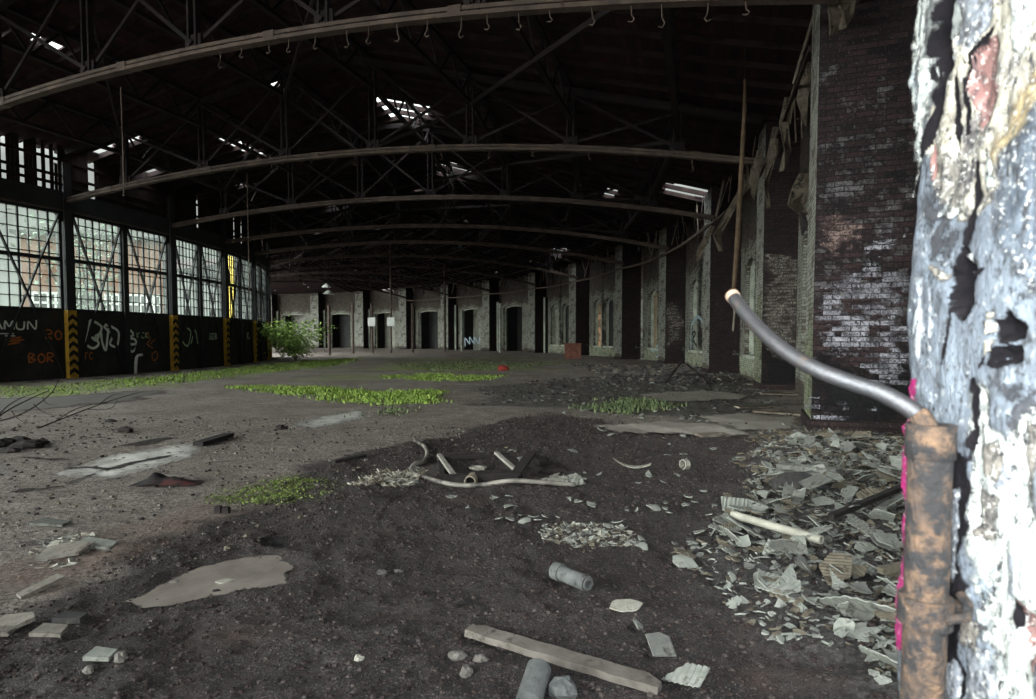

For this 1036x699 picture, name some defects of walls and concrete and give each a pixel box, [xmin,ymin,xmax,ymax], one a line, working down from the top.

flaking render [922,0,1036,365]